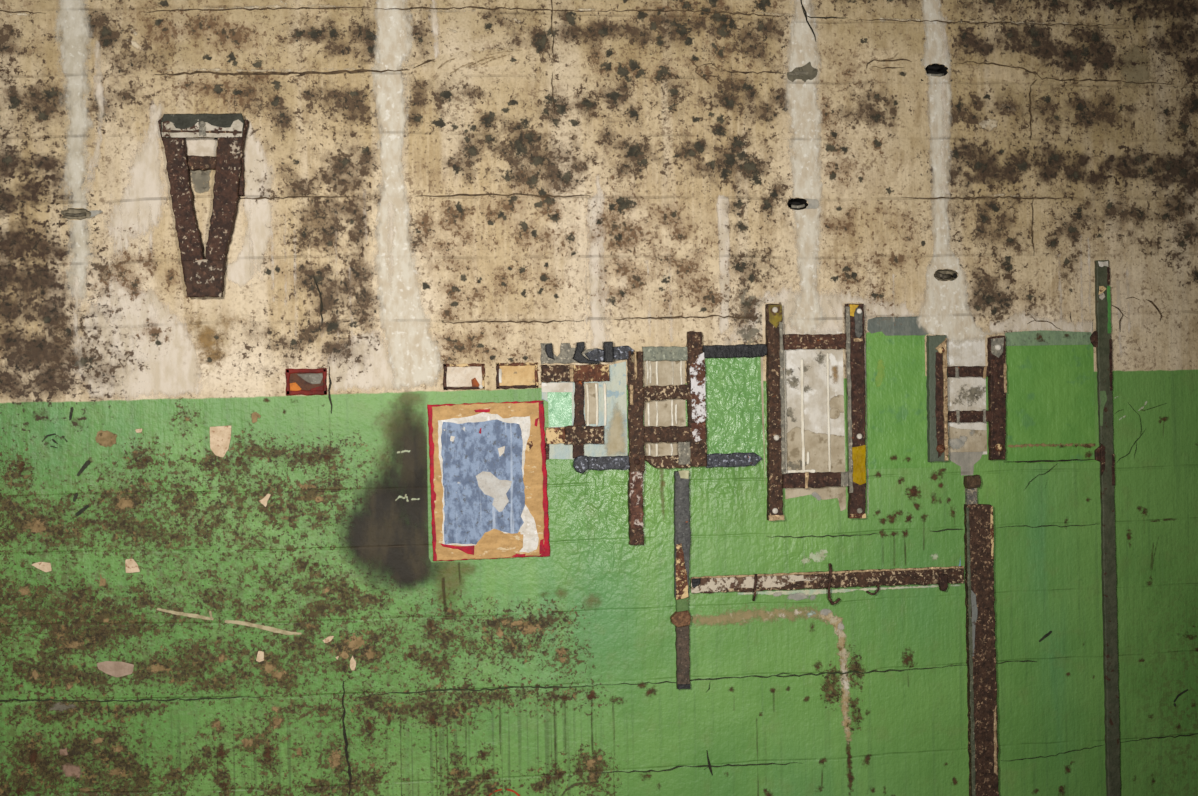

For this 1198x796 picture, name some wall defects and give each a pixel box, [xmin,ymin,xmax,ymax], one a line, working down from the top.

damp [817,0,1198,333]
peeling [0,398,622,796]
corrosion [875,352,955,555]